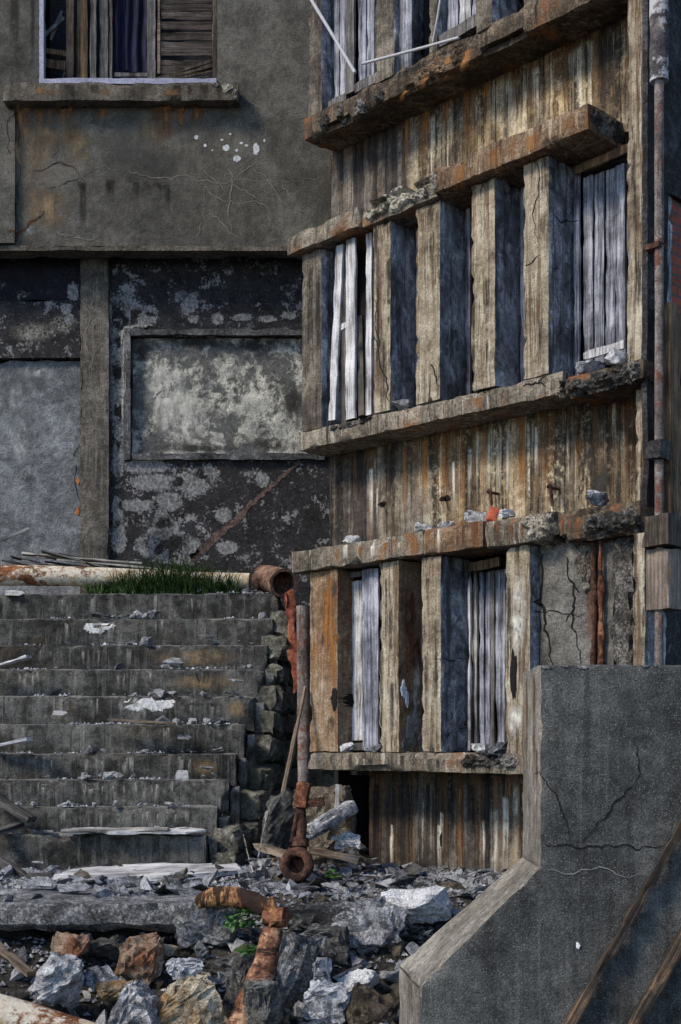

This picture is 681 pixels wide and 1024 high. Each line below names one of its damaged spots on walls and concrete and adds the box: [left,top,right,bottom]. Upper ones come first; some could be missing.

crack [7,110,321,241]
peeling [194,133,265,162]
spalling [364,171,437,221]
damp [286,392,299,417]
spalling [555,360,641,400]
spalling [520,505,644,594]
crack [533,554,583,665]
corrosion [588,540,605,665]
crack [534,746,679,878]